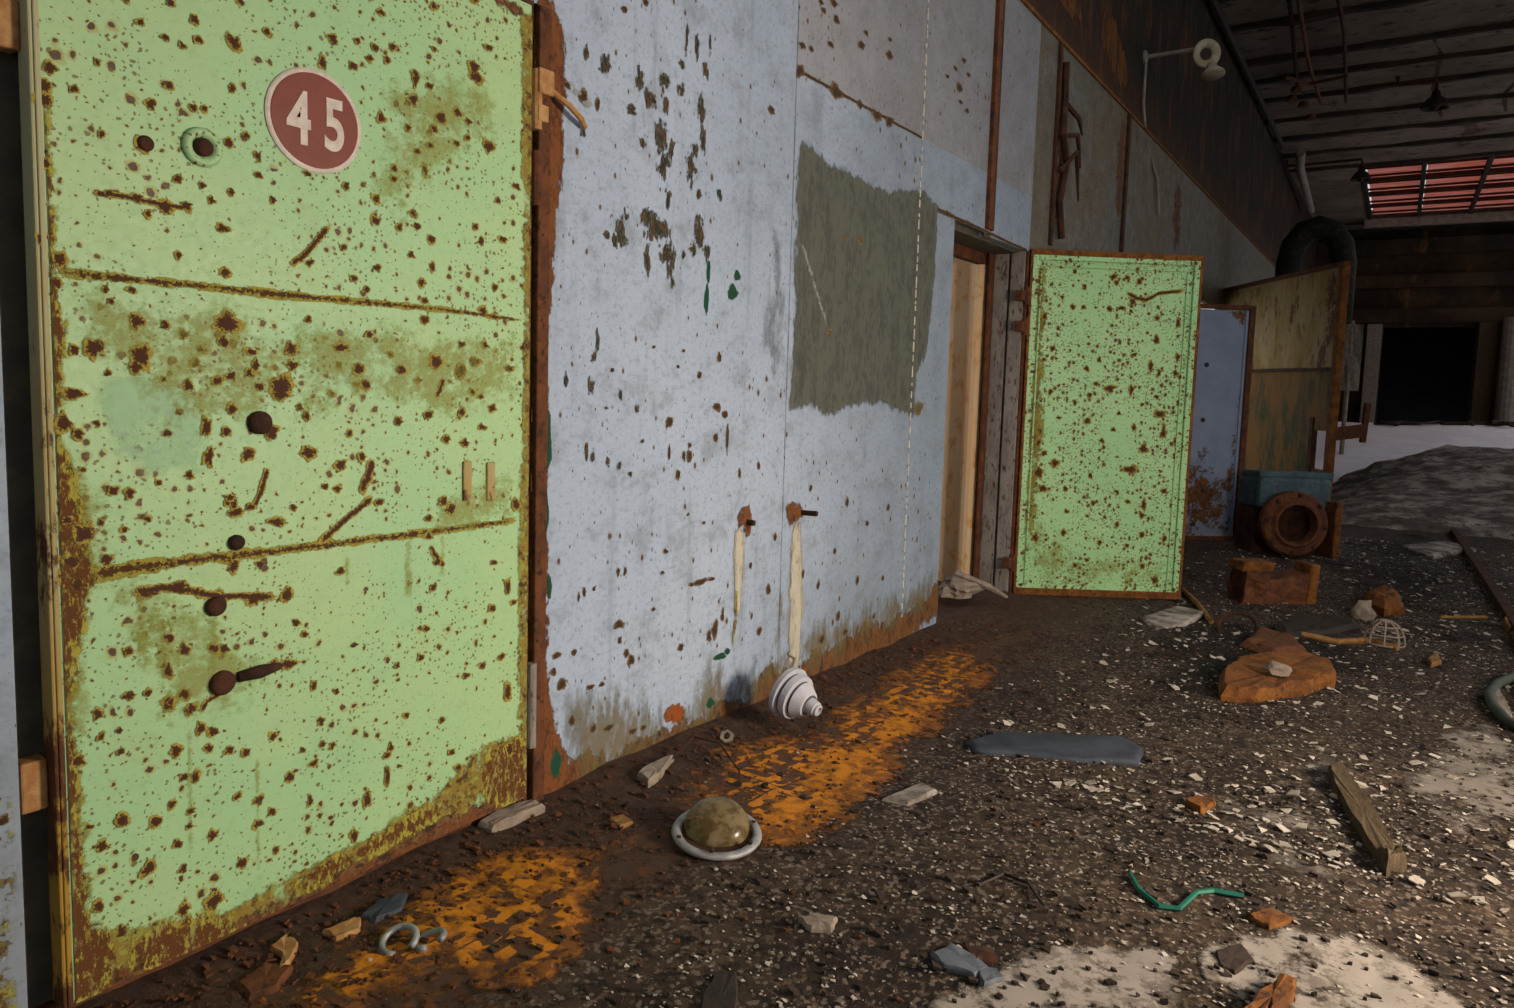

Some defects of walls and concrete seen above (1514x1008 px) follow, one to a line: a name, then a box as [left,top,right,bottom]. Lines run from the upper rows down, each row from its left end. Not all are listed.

peeling [789,142,938,417]
corrosion [31,0,1048,1008]
damp [683,501,930,726]
corrosion [1012,186,1240,600]
corrosion [0,798,13,839]
damp [572,697,662,770]
corrosion [0,867,17,1008]